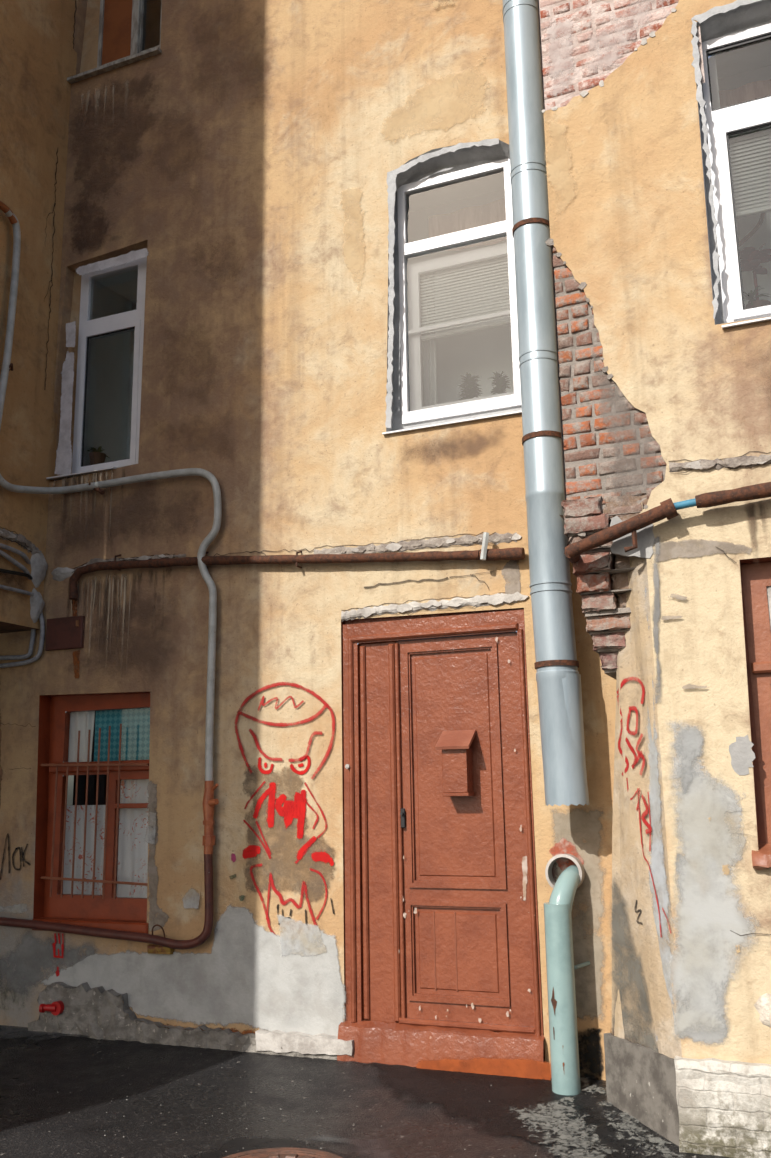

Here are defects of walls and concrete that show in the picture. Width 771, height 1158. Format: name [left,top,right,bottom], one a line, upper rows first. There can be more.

flaking render [696,26,705,83]
flaking render [539,0,679,212]
leakage [73,77,152,251]
crack [44,149,58,387]
flaking render [314,532,522,554]
crack [364,571,492,589]
flaking render [341,560,529,622]
leakage [747,505,762,534]
flaking render [545,238,771,1035]
flaking render [28,982,354,1060]